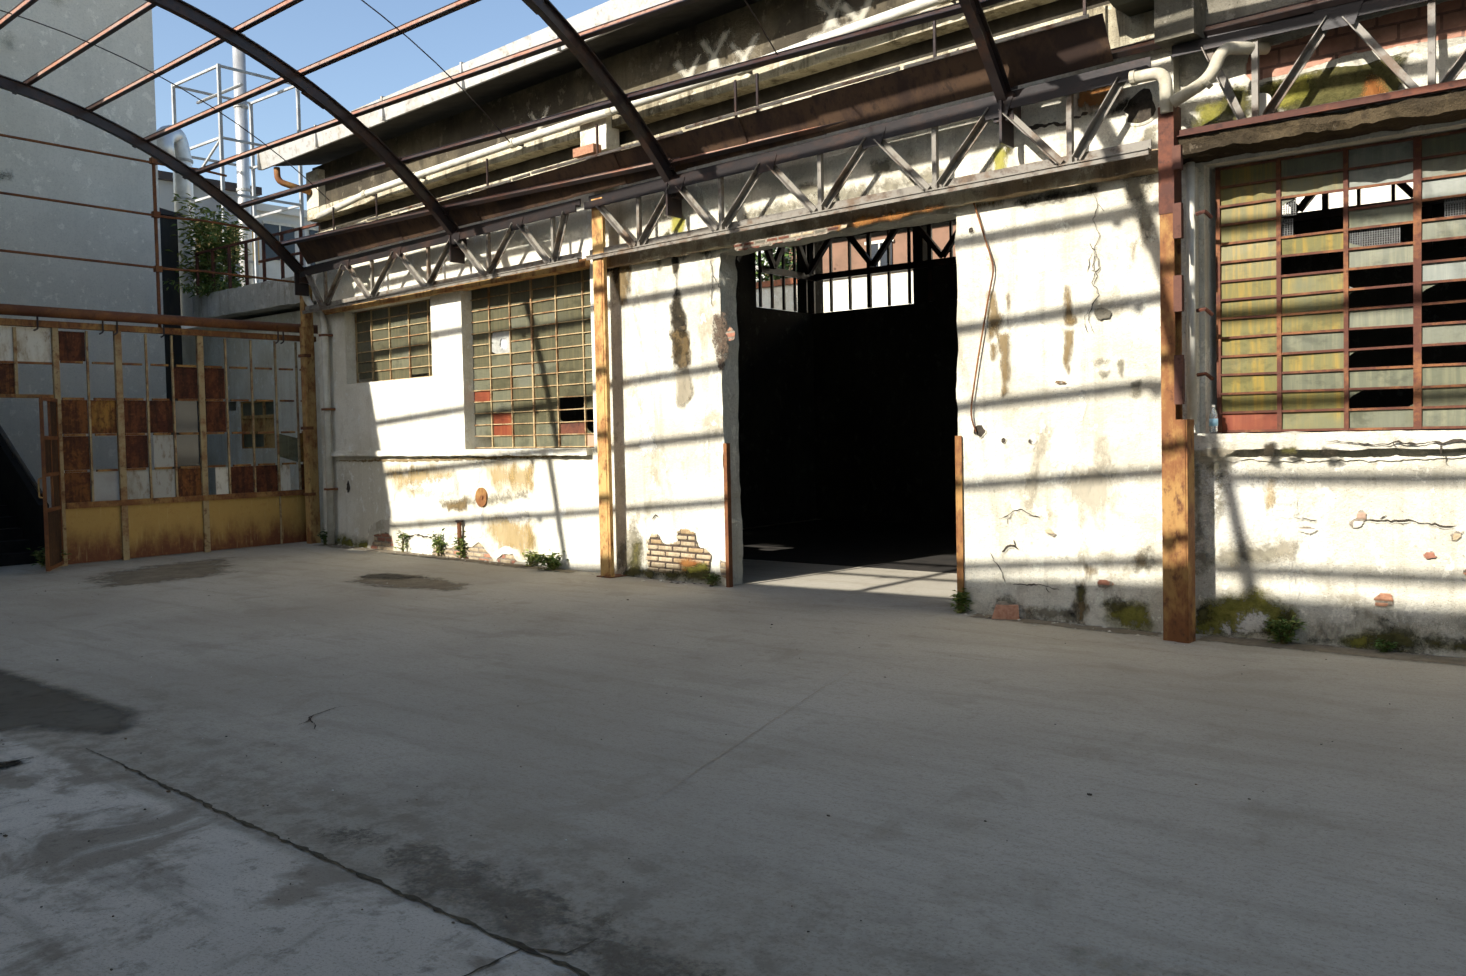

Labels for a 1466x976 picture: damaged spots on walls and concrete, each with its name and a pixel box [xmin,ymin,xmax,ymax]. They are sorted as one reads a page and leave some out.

crack [1084,197,1104,332]
leakage [390,470,450,491]
leakage [439,463,533,555]
flaking render [646,528,726,578]